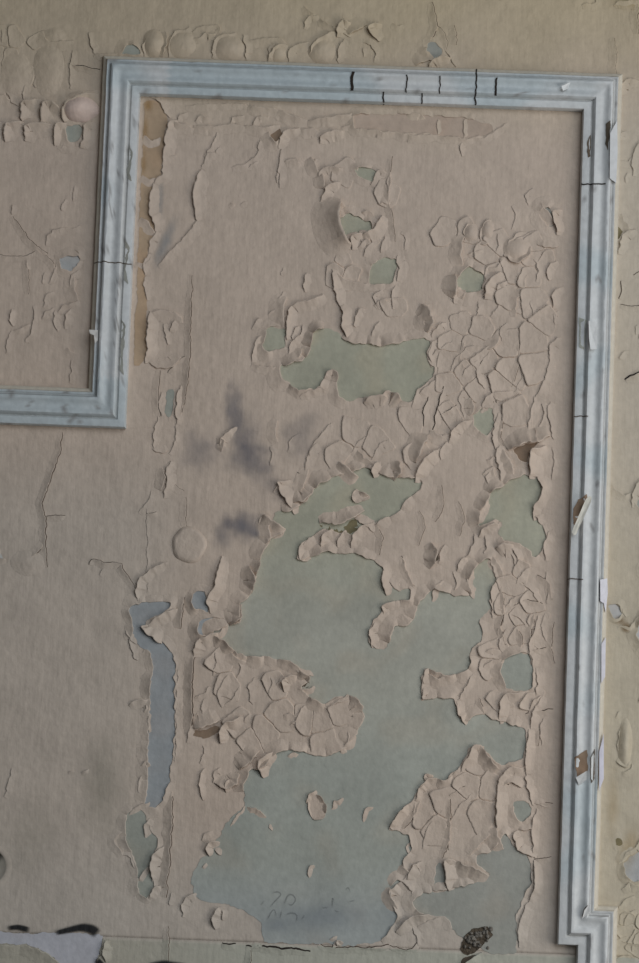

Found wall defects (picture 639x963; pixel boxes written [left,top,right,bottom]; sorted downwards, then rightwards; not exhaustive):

crack [0,217,57,294]
crack [619,271,639,312]
peeling [579,317,597,350]
crack [625,372,639,384]
peeling [107,97,566,963]
peeling [573,494,587,525]
peeling [600,579,639,658]
peeling [611,832,639,962]
peeling [0,931,113,963]